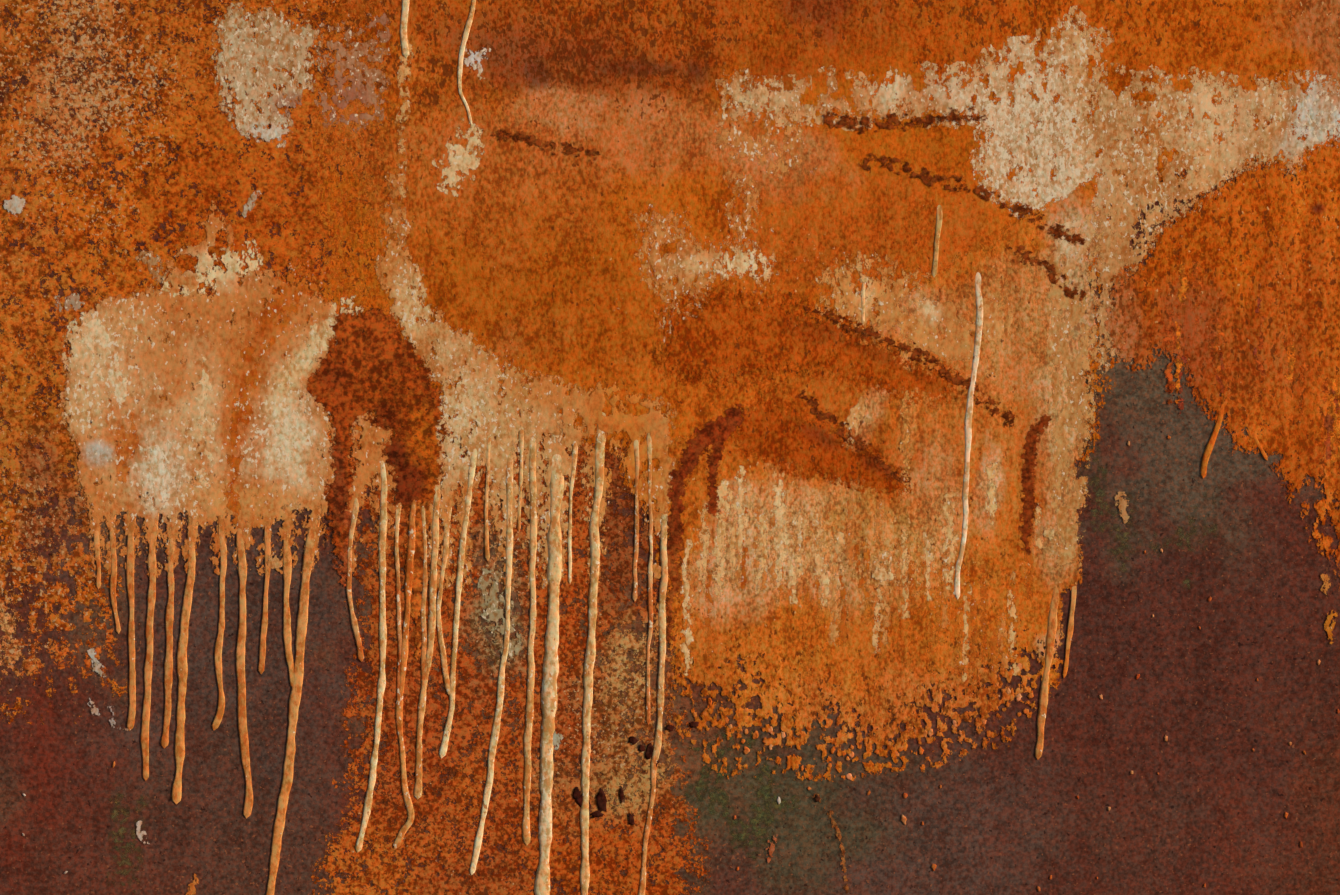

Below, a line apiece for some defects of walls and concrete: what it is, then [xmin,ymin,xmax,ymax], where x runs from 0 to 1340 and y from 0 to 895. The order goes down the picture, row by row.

corrosion [1006,151,1033,183]
corrosion [1005,240,1087,301]
corrosion [1075,99,1340,588]
corrosion [973,381,1015,427]
corrosion [513,433,530,505]
corrosion [538,433,551,487]
corrosion [1016,414,1052,555]
corrosion [436,480,463,680]
corrosion [0,689,44,724]
corrosion [100,665,128,699]
corrosion [549,409,597,895]
corrosion [588,430,661,895]